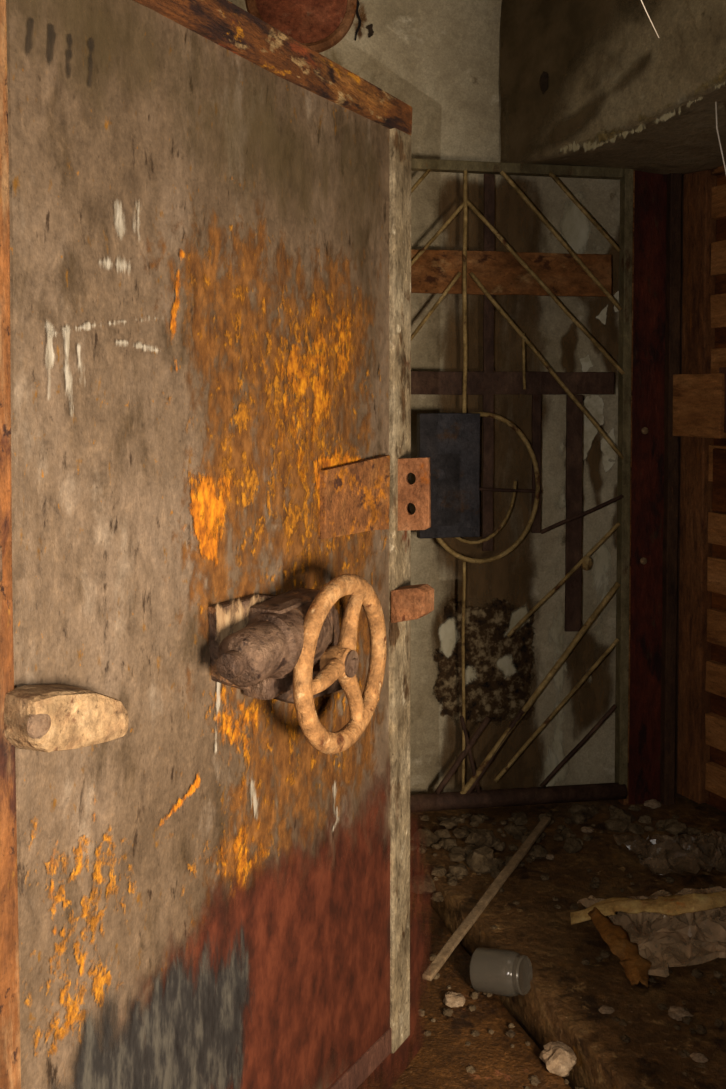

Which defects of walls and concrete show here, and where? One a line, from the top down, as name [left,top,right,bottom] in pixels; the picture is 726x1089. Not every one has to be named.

water stain [498,0,703,166]
water stain [439,179,542,253]
water stain [443,294,542,372]
water stain [561,229,620,384]
corrosion [152,214,387,637]
water stain [582,425,603,506]
corrosion [356,606,370,694]
water stain [433,394,547,792]
water stain [564,632,612,732]
corrosion [161,775,200,825]
corrosion [206,684,380,890]
corrosion [35,828,135,1054]